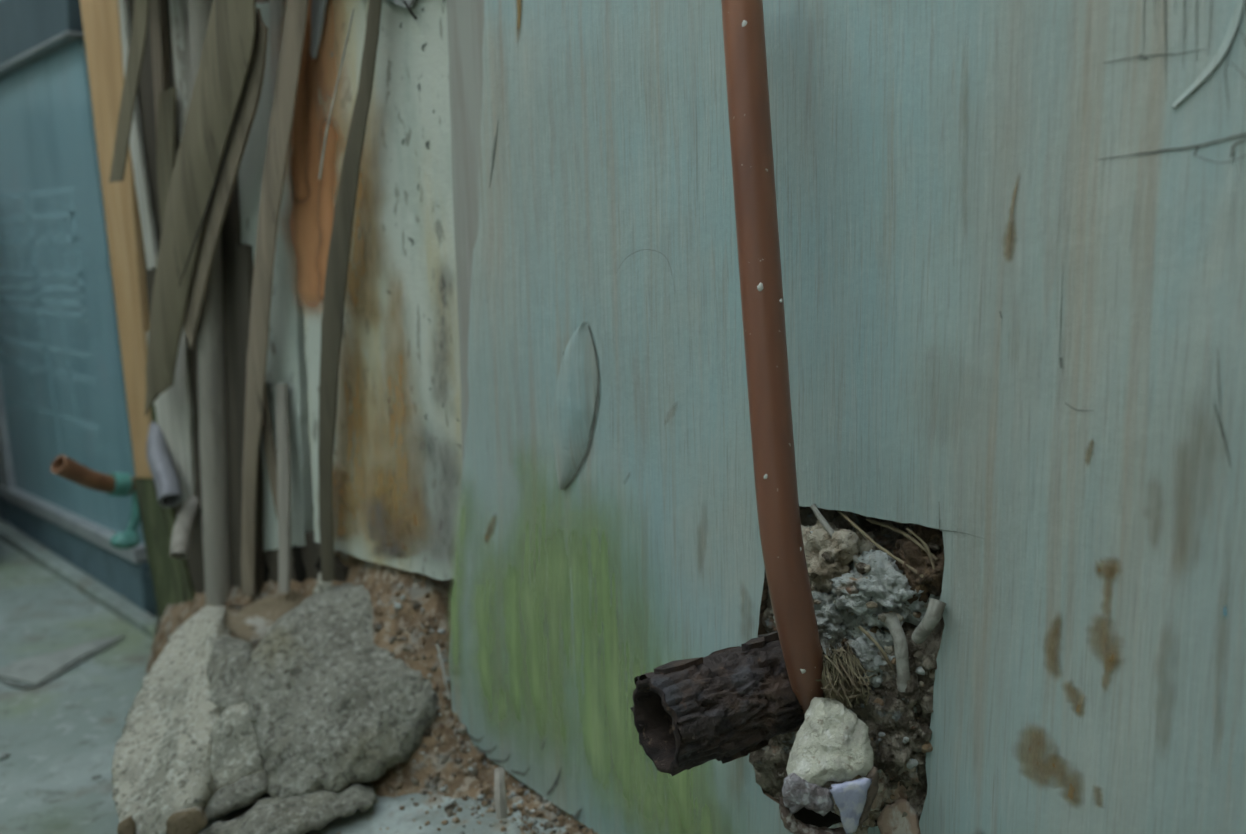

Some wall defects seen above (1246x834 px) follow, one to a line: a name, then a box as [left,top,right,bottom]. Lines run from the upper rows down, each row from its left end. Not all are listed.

crack [1098,0,1246,163]
corrosion [288,0,339,309]
spalling [799,506,917,554]
spalling [880,616,945,728]
corrosion [1093,561,1117,686]
spalling [749,731,798,799]
peeling [853,751,928,834]
corrosion [1022,730,1078,803]